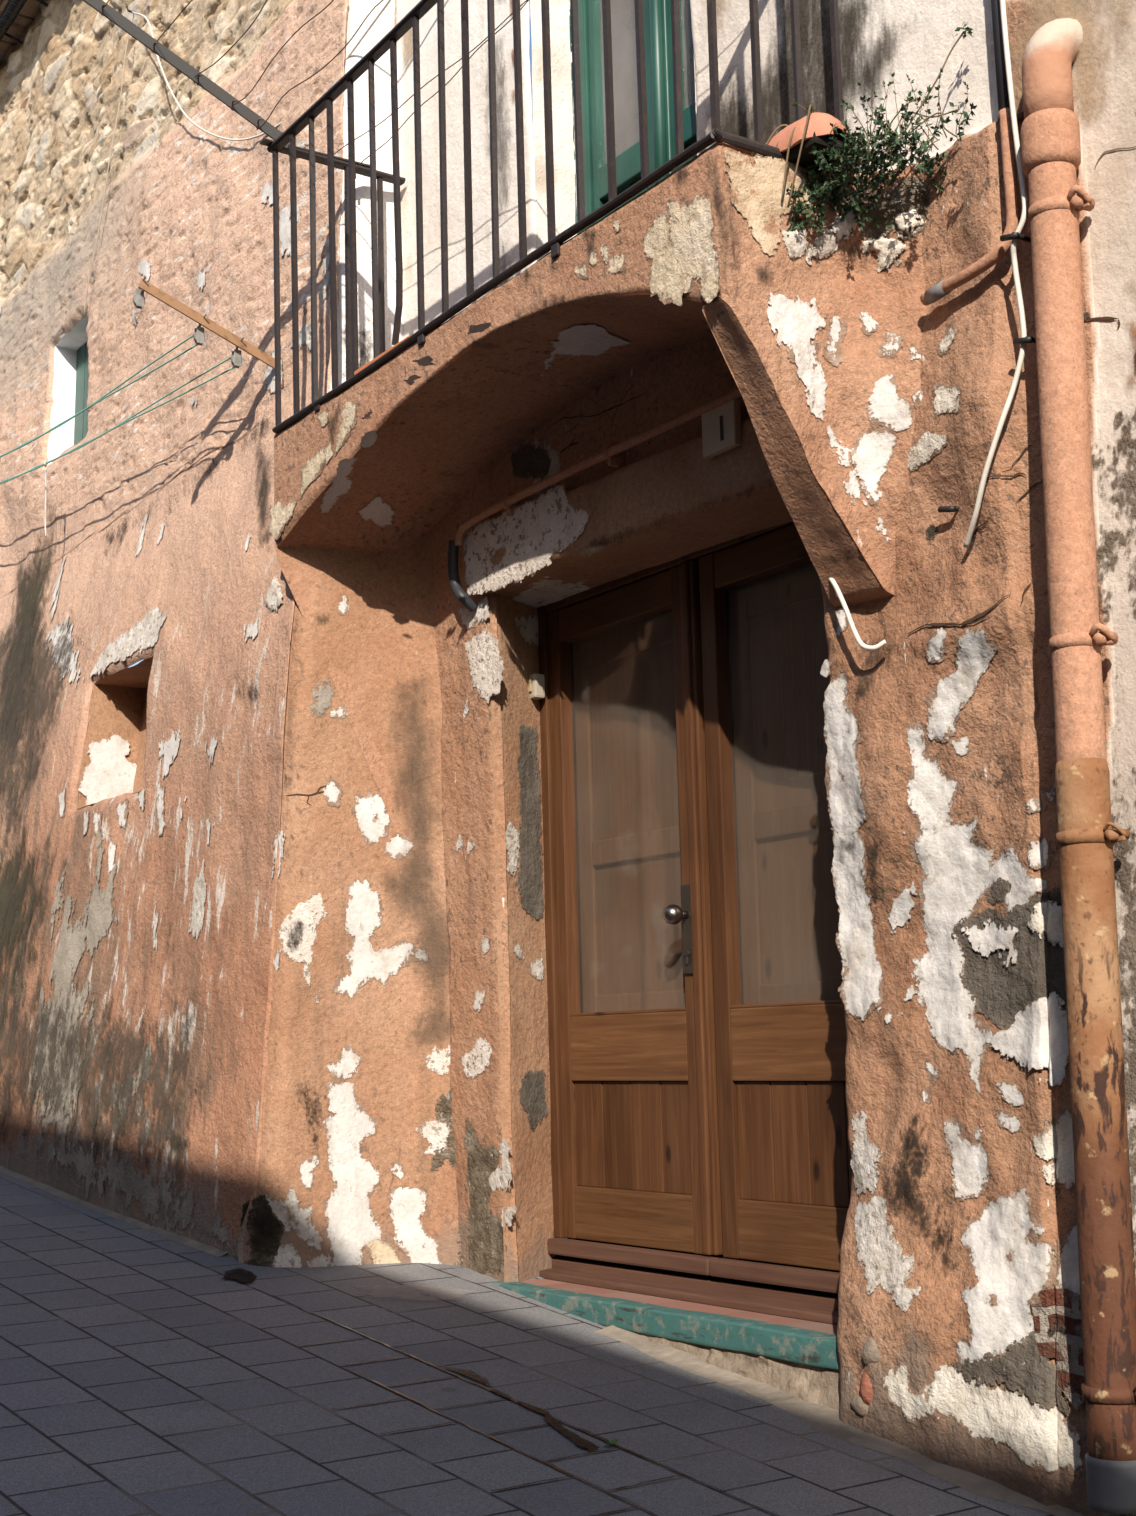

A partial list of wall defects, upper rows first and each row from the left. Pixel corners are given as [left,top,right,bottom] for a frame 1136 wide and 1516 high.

leakage [708,0,896,145]
leakage [1011,0,1126,117]
peeling [575,221,626,279]
peeling [643,192,721,307]
peeling [724,149,930,273]
flaking render [45,556,167,688]
peeling [457,439,591,719]
peeling [764,293,961,558]
peeling [1091,411,1136,622]
peeling [29,730,517,1274]
peeling [820,627,1086,1477]
peeling [1111,767,1136,1267]